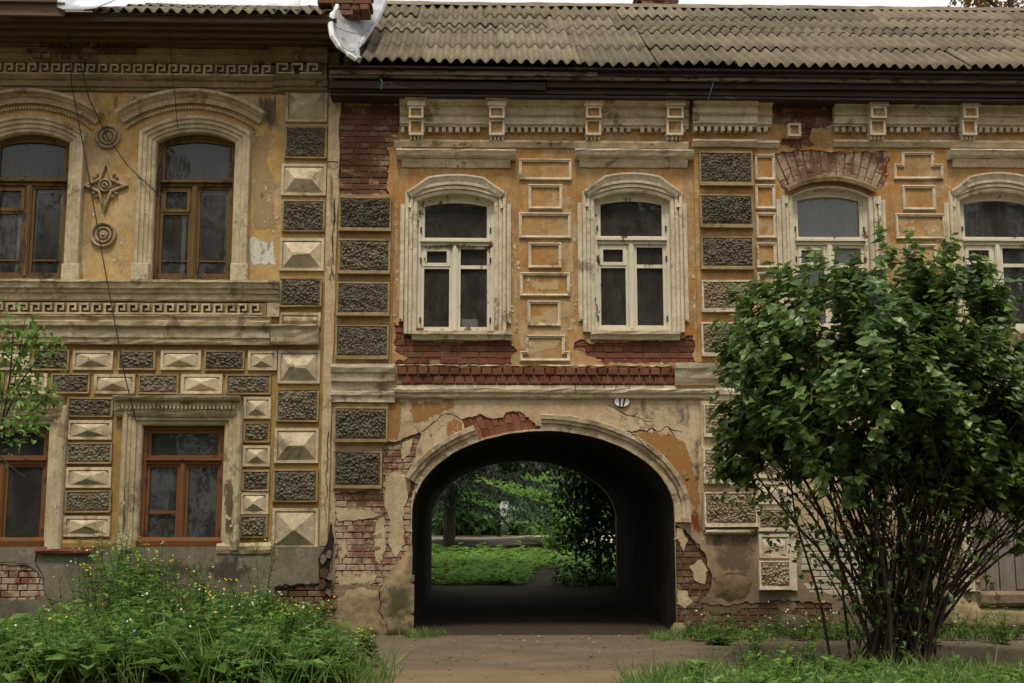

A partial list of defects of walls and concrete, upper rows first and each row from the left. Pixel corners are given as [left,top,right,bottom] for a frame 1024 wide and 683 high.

flaking render [769,108,891,190]
peeling [249,237,276,265]
flaking render [393,205,697,385]
crack [388,413,466,452]
crack [607,404,681,479]
peeling [638,431,700,512]
flaking render [273,399,539,635]
flaking render [0,565,44,602]
flaking render [673,524,876,634]